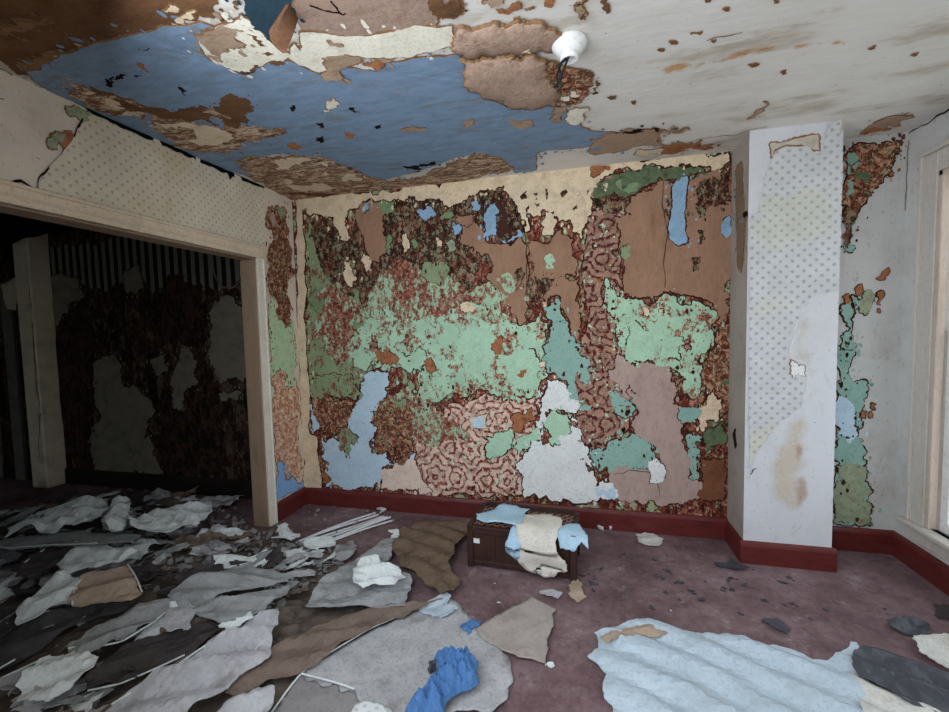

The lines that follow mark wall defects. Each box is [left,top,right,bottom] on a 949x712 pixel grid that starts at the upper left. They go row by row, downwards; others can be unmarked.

crack [12,107,264,188]
peeling [0,0,748,507]
peeling [845,152,871,197]
peeling [832,267,891,529]